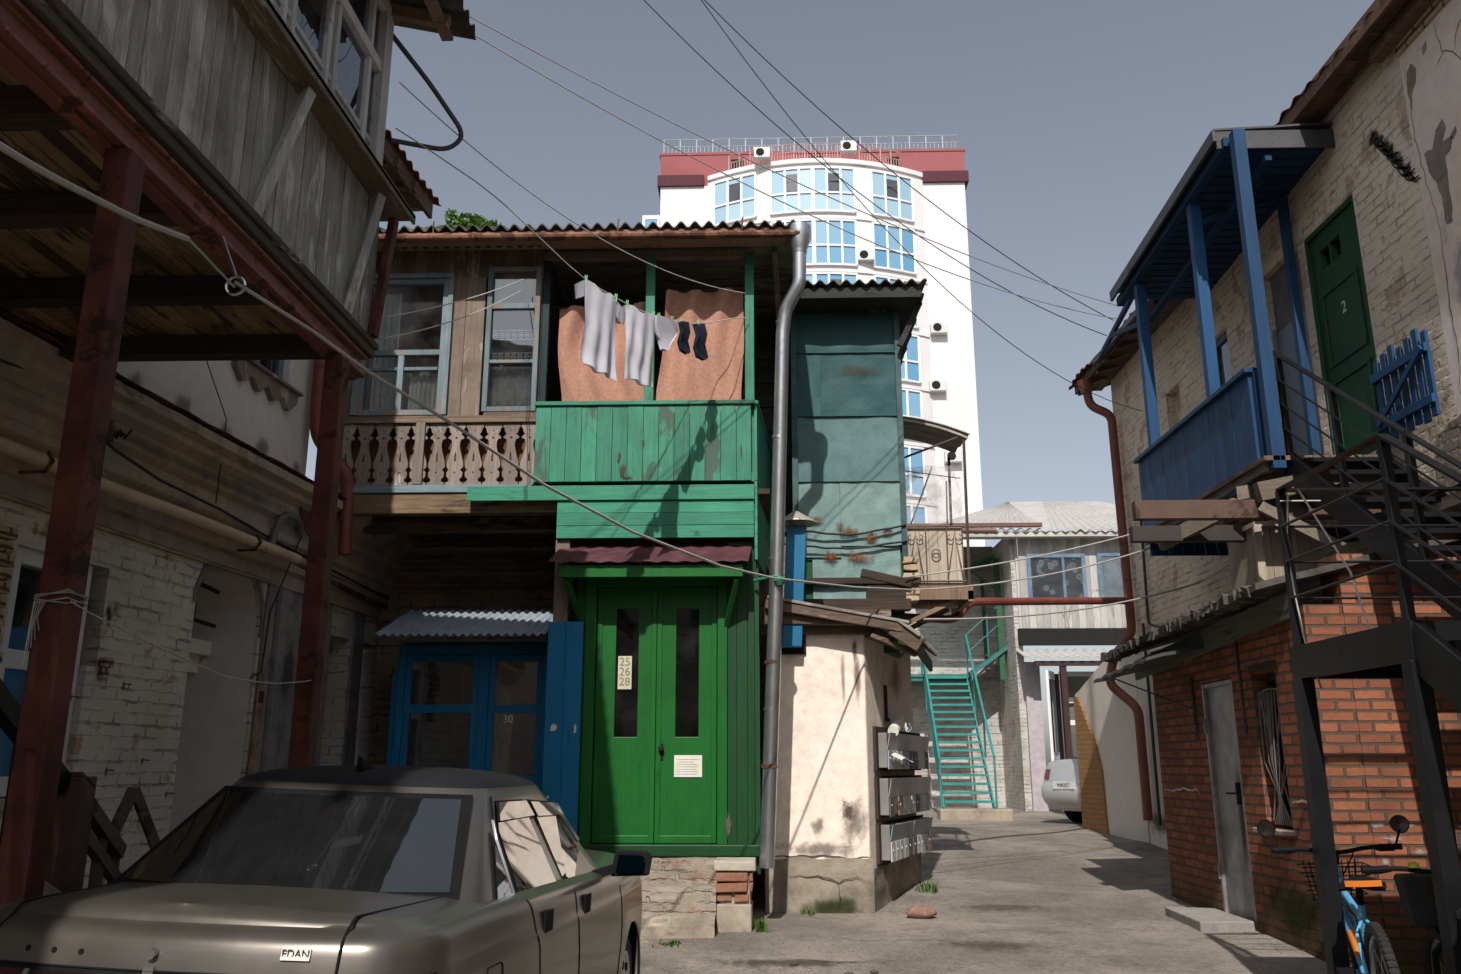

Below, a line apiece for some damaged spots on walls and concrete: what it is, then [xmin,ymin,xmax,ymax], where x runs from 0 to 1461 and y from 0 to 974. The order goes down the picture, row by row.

crack [1402,20,1461,393]
peeling [1424,119,1457,245]
spalling [1436,414,1461,487]
water stain [797,802,861,855]